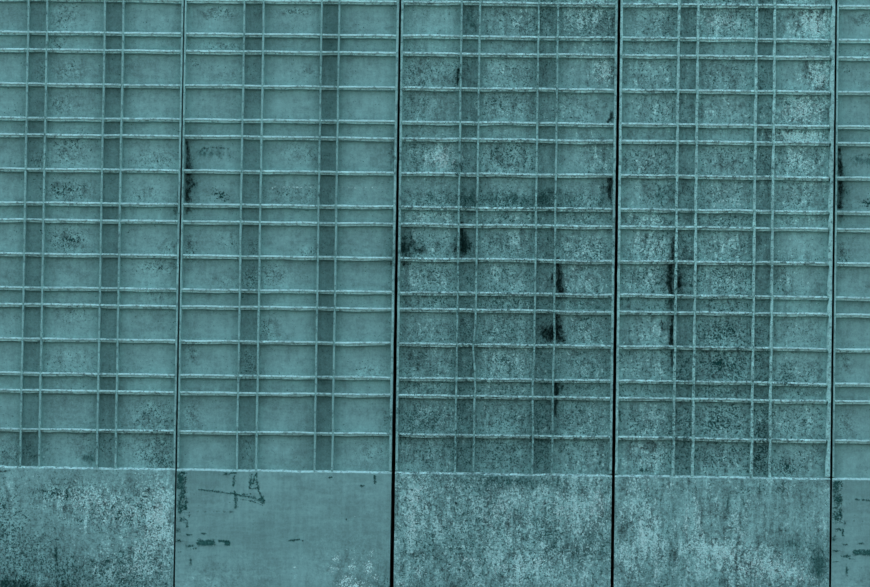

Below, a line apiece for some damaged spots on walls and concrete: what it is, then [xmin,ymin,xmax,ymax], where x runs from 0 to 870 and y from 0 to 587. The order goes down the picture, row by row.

peeling [39,471,230,582]
peeling [832,481,870,576]
damp [0,571,36,587]